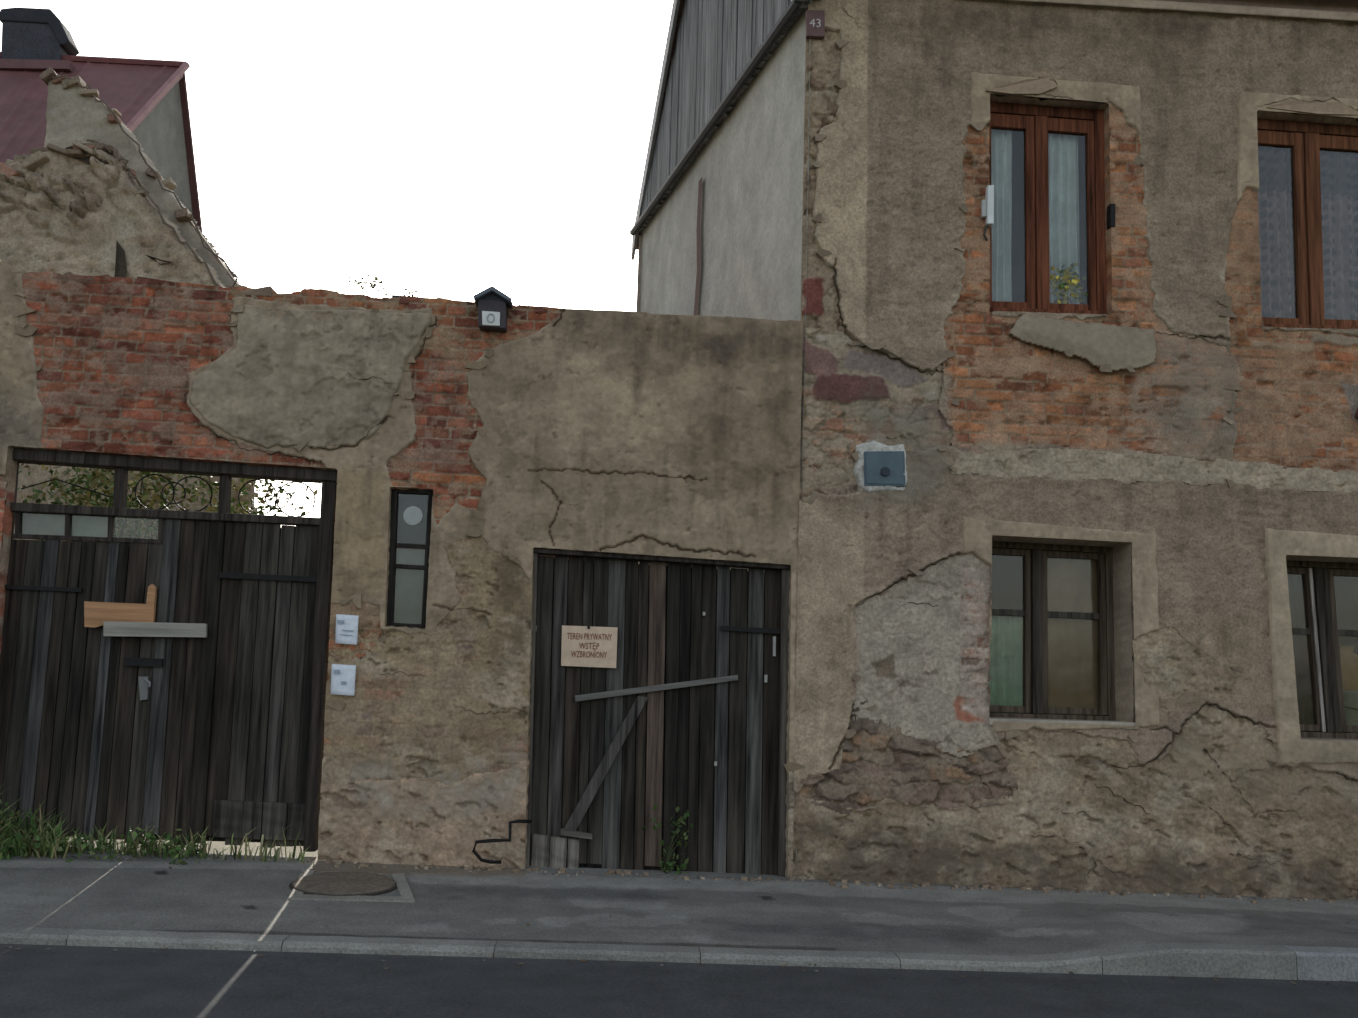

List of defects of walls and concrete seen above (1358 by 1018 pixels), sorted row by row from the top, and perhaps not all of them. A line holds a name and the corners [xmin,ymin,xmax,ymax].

spalling [0,67,563,524]
spalling [799,30,1358,505]
spalling [323,527,532,792]
crack [529,468,705,545]
crack [599,535,753,557]
crack [895,751,994,798]
spalling [783,553,1358,900]
crack [1026,703,1305,883]